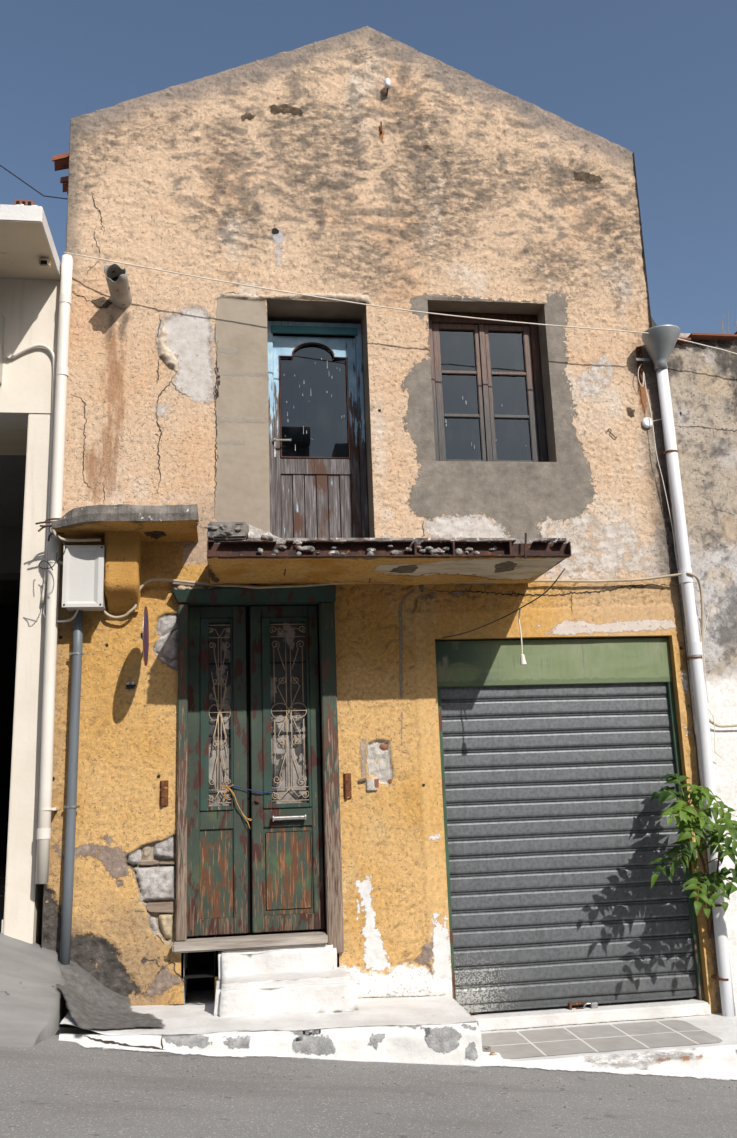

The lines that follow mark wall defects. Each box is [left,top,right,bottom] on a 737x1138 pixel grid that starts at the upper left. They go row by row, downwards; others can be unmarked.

peeling [156,305,219,404]
rust [89,338,123,493]
crack [156,316,186,493]
crack [212,344,220,507]
spalling [153,612,179,671]
crack [323,573,674,613]
peeling [373,512,650,601]
peeling [537,619,676,636]
spalling [42,833,184,997]
peeling [414,938,434,974]